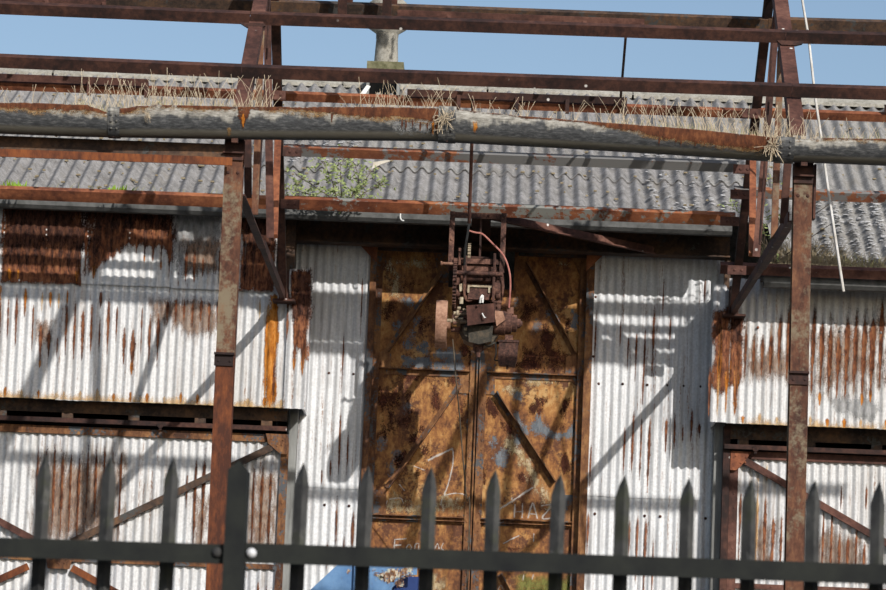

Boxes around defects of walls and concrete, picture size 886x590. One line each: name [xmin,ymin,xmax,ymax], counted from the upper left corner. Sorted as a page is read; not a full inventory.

rust [0,102,107,117]
rust [119,105,439,135]
rust [28,443,127,540]
rust [0,387,214,406]
rust [0,209,222,375]
rust [186,449,209,544]
rust [233,218,315,408]
peeling [488,390,577,484]
rust [623,414,651,493]
rust [708,306,790,426]
rust [755,492,783,561]
rust [809,301,886,406]